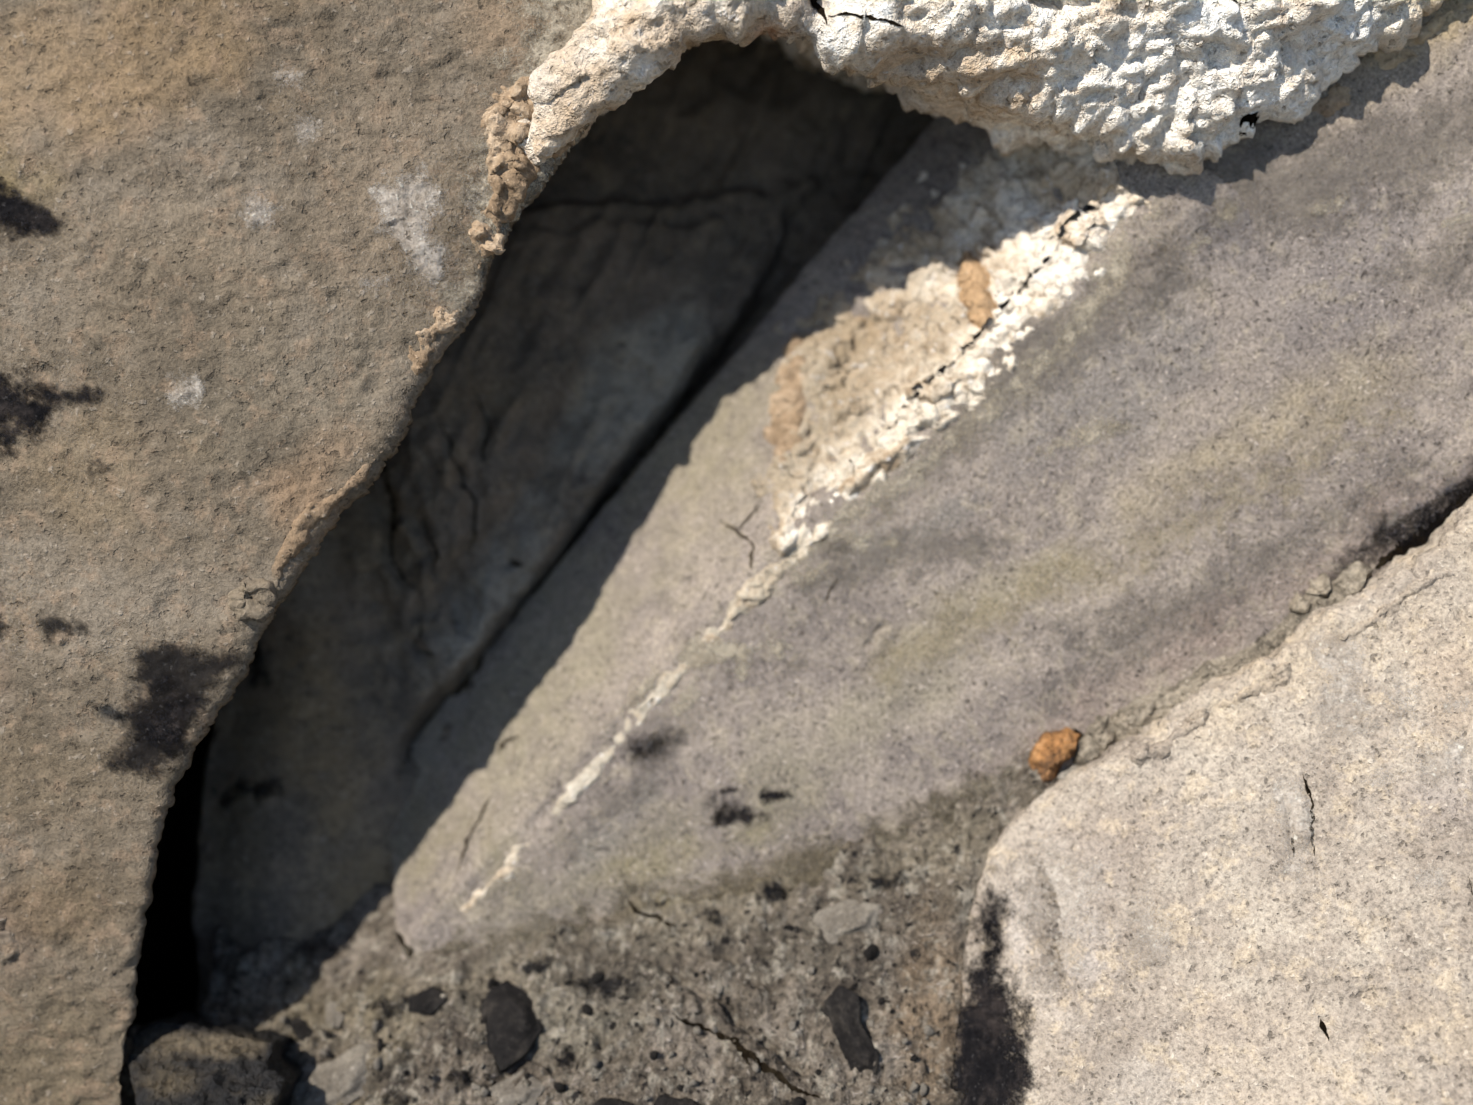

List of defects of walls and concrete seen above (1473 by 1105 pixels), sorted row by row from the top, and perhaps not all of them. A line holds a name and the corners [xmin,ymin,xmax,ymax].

spalling [1239,111,1260,136]
water stain [0,178,62,241]
spalling [468,76,597,271]
spalling [408,306,461,375]
water stain [0,371,102,457]
spalling [227,451,382,622]
spalling [460,141,1161,914]
crack [1374,484,1473,569]
water stain [39,617,86,641]
water stain [94,642,269,776]
spalling [1128,662,1292,766]
spalling [1288,776,1315,856]